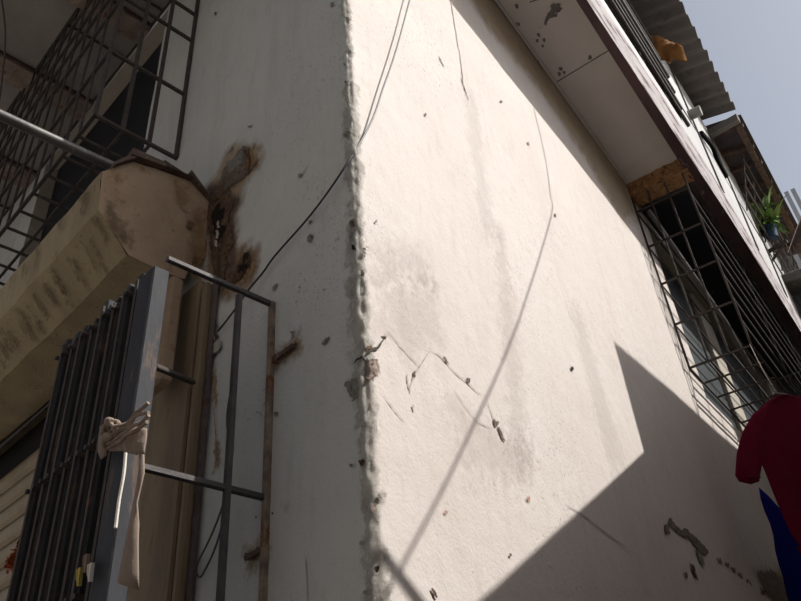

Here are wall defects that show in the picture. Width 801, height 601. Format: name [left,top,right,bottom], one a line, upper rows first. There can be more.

peeling [535,3,562,48]
spalling [207,145,260,299]
peeling [330,0,392,601]
crack [385,327,505,441]
peeling [664,518,709,580]
peeling [717,557,788,601]